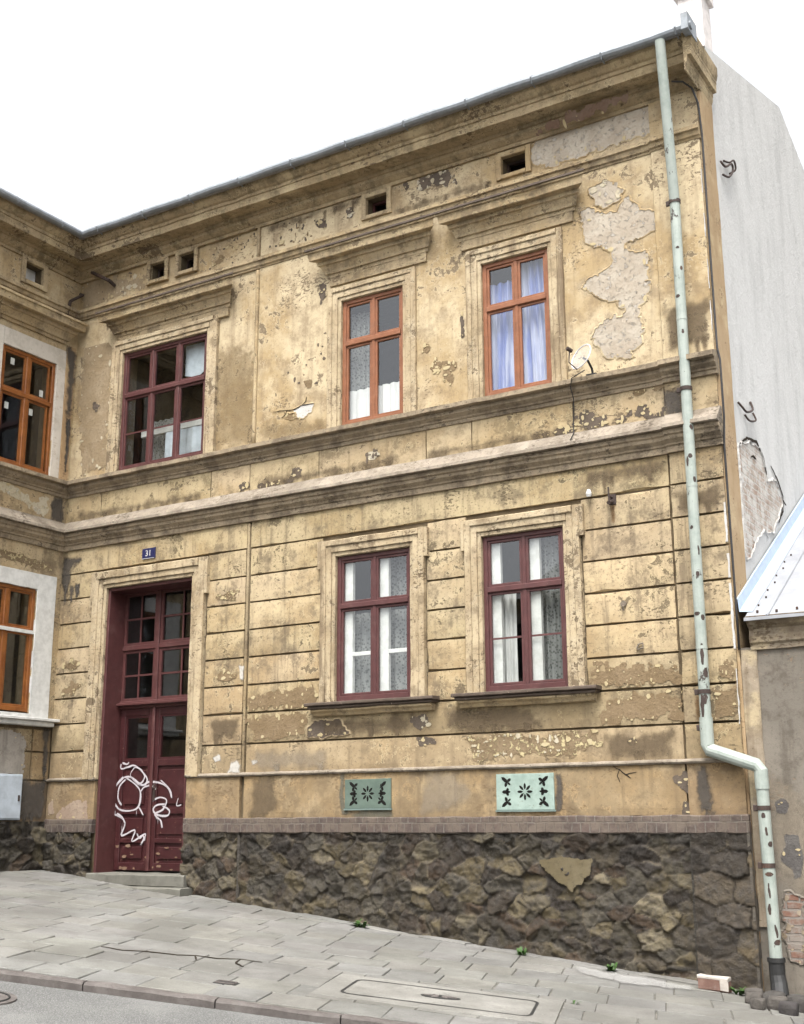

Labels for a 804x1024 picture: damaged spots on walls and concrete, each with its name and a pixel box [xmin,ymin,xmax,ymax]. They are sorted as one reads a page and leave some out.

spalling [531,93,650,169]
peeling [403,169,458,191]
spalling [578,178,655,361]
peeling [422,343,461,385]
spalling [283,402,315,421]
peeling [542,384,666,438]
peeling [737,440,783,562]
peeling [245,684,351,741]
peeling [465,661,685,763]
water stain [697,766,715,815]
peeling [761,798,804,966]